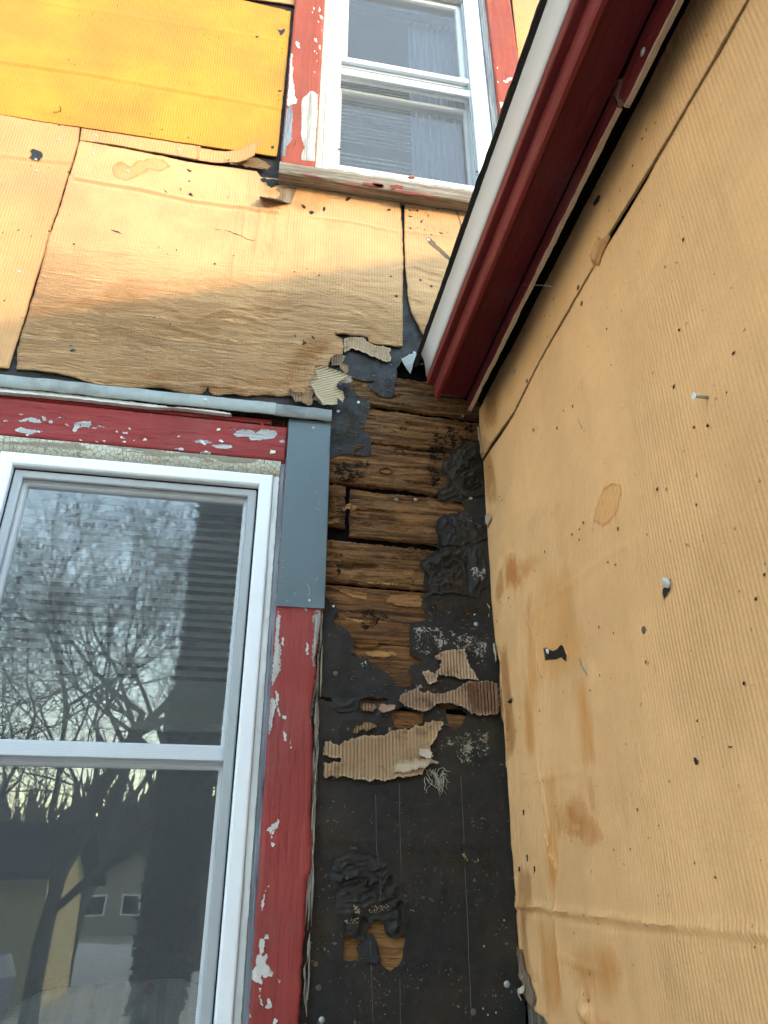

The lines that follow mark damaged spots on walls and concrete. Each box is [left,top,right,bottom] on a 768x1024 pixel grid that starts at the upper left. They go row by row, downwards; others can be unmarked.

peeling [280,41,318,162]
peeling [4,411,147,443]
peeling [195,422,286,455]
peeling [268,611,282,734]
peeling [303,607,323,667]
peeling [252,934,280,1024]